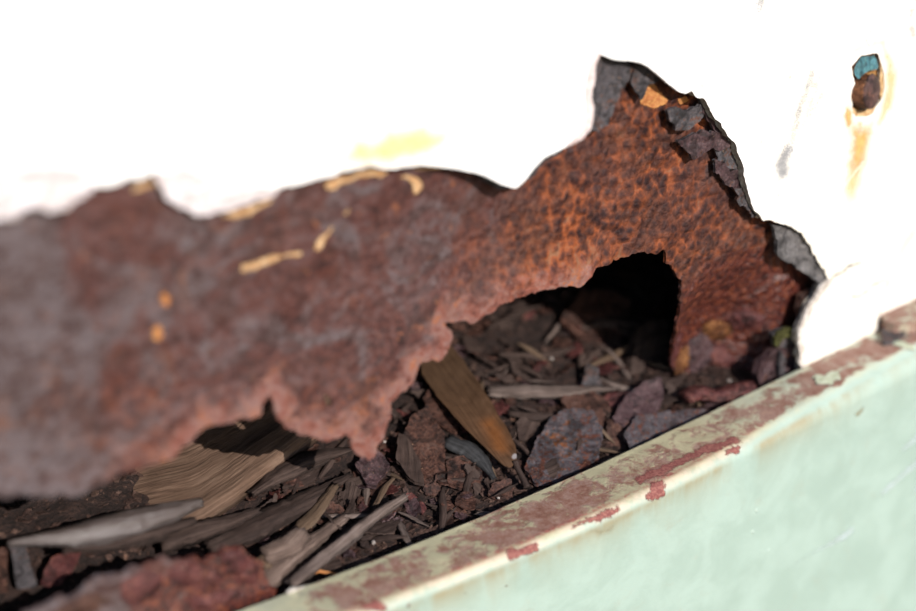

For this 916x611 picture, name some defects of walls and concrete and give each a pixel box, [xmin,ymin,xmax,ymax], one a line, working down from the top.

peeling [629,62,659,100]
peeling [675,98,756,218]
corrosion [846,108,868,191]
peeling [0,165,94,220]
peeling [150,167,278,216]
corrosion [0,77,815,500]
peeling [768,223,832,378]
peeling [811,370,841,386]
corrosion [573,506,619,528]
corrosion [0,544,277,611]
corrosion [359,599,386,611]
corrosion [506,543,539,561]